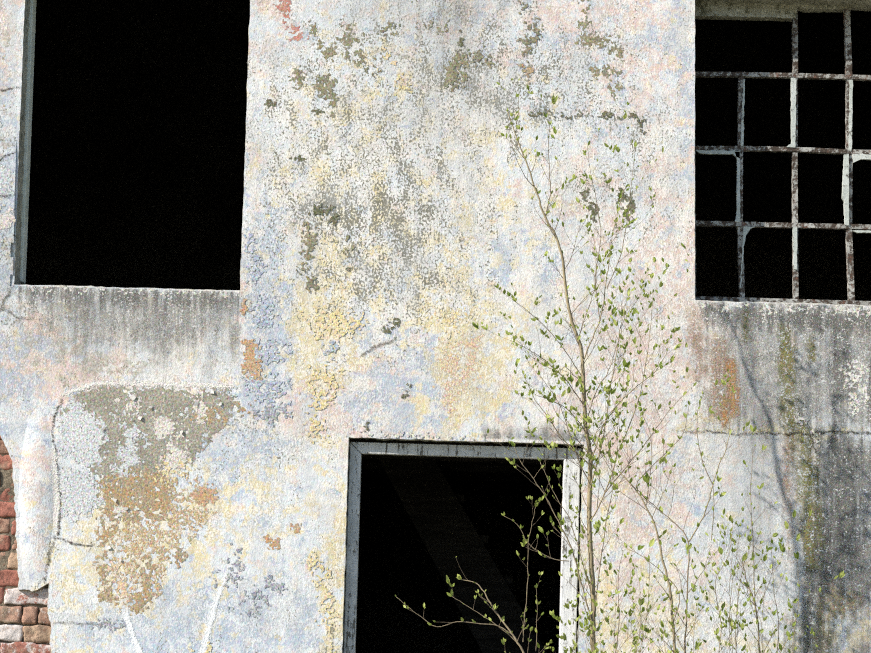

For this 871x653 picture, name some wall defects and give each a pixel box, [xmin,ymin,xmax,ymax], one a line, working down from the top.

peeling [0,165,16,258]
peeling [296,202,339,293]
crack [0,285,33,320]
leakage [31,286,240,339]
spalling [358,317,400,357]
peeling [422,299,484,418]
peeling [51,233,374,618]
flaking render [345,421,511,441]
leakage [669,301,871,653]
crack [685,413,871,453]
flaking render [0,435,56,653]